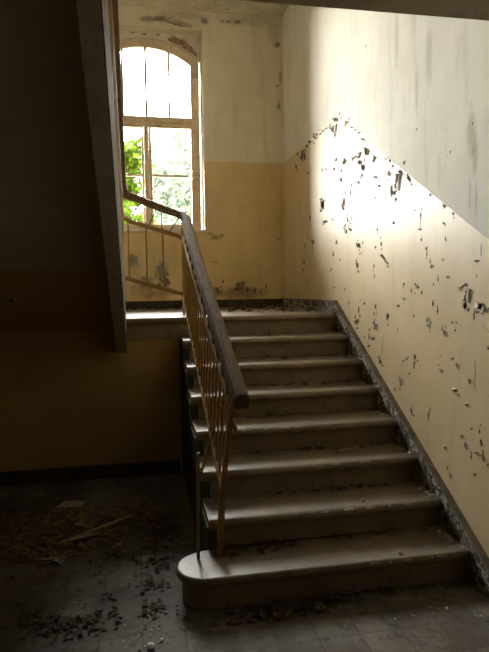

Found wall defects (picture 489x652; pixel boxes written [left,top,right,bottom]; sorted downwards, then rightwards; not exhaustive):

flaking render [168,35,197,57]
peeling [295,112,413,237]
peeling [457,283,489,320]
peeling [460,424,489,466]